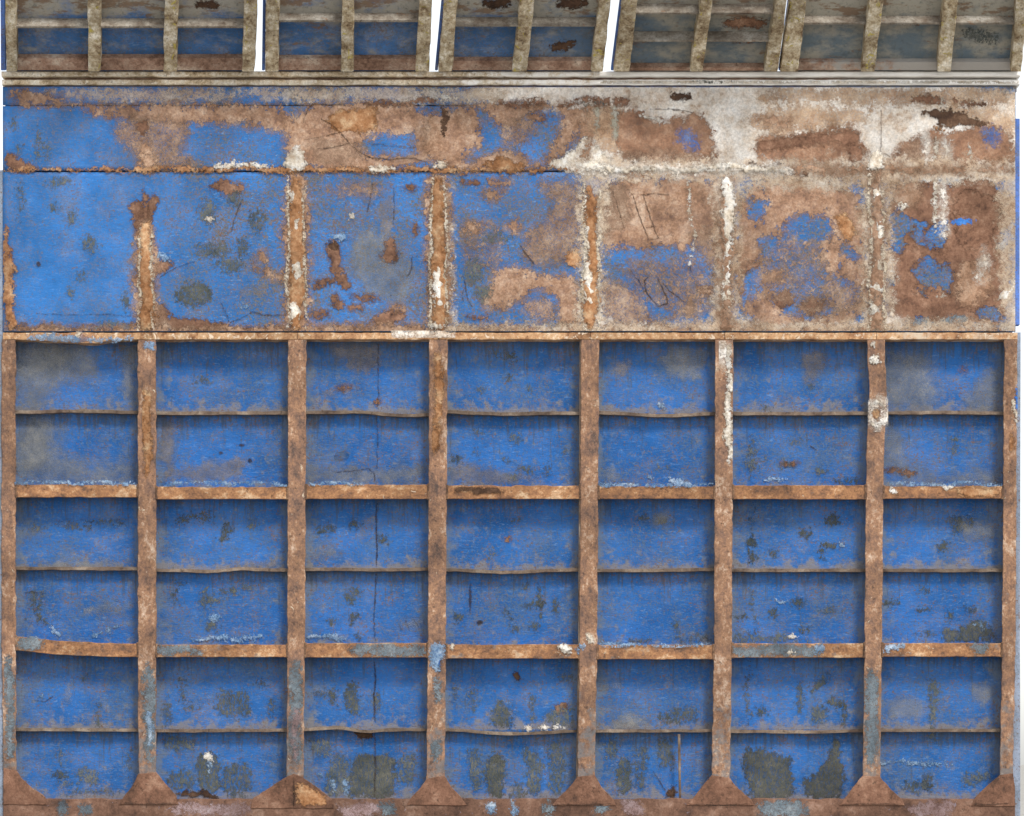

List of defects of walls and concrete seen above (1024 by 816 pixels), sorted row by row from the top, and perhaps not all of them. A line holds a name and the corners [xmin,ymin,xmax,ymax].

rust [4,88,1015,331]
leakage [45,80,1018,485]
leakage [21,344,138,484]
rust [432,352,445,454]
rust [455,487,505,495]
rust [942,485,1000,498]
rust [176,789,219,799]
rust [293,782,327,807]
leakage [306,738,418,799]
rust [354,732,376,789]
leakage [449,685,575,799]
leakage [739,738,848,799]